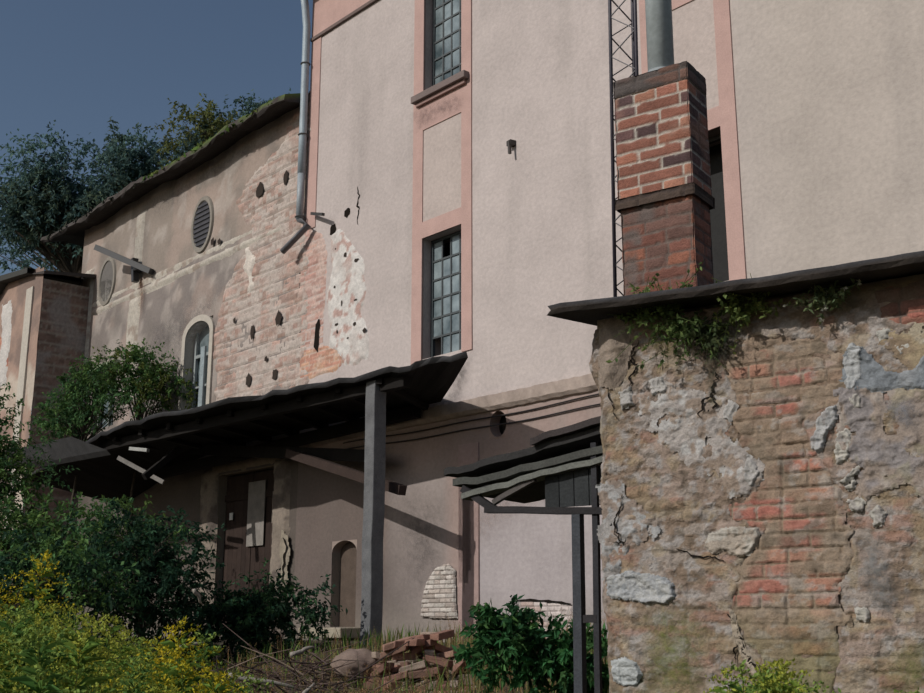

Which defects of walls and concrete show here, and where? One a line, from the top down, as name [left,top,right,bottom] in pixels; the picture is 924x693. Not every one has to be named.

spalling [213,91,369,402]
flaking render [0,300,13,387]
crack [608,341,639,419]
crack [697,372,719,417]
spalling [875,278,924,370]
flaking render [421,564,458,619]
crack [613,496,626,546]
flaking render [595,479,676,604]
crack [676,548,724,561]
spalling [618,333,924,693]
crack [727,609,765,686]